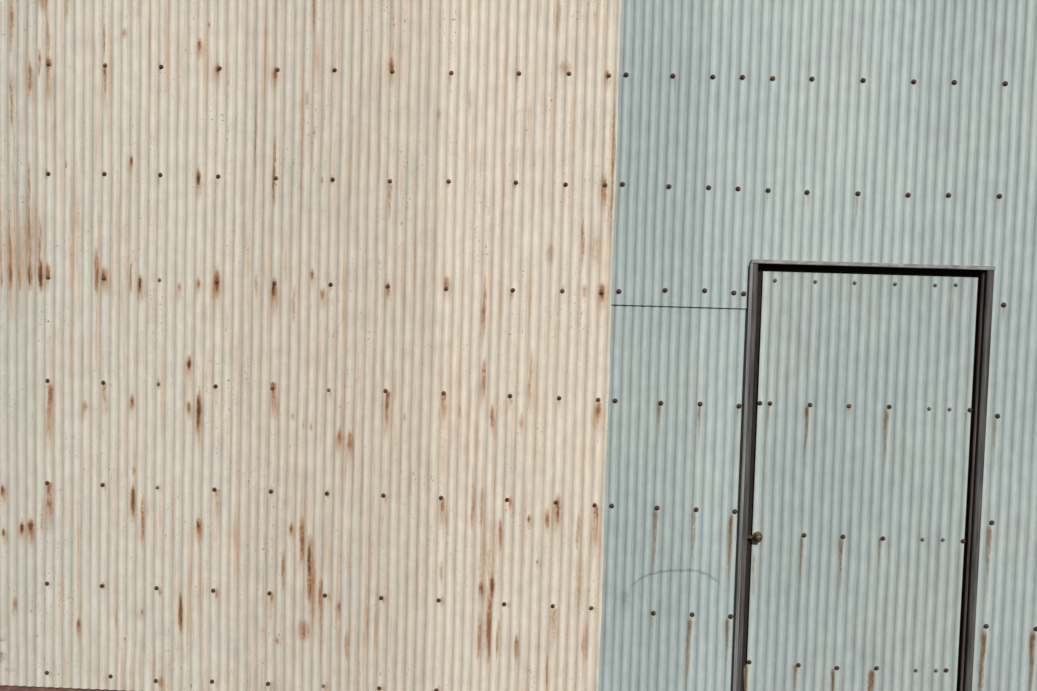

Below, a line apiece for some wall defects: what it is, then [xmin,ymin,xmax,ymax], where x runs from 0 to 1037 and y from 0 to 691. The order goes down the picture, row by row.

rust [1,218,50,288]
rust [187,395,201,429]
rust [290,523,322,603]
rust [478,578,499,655]
rust [978,631,987,691]